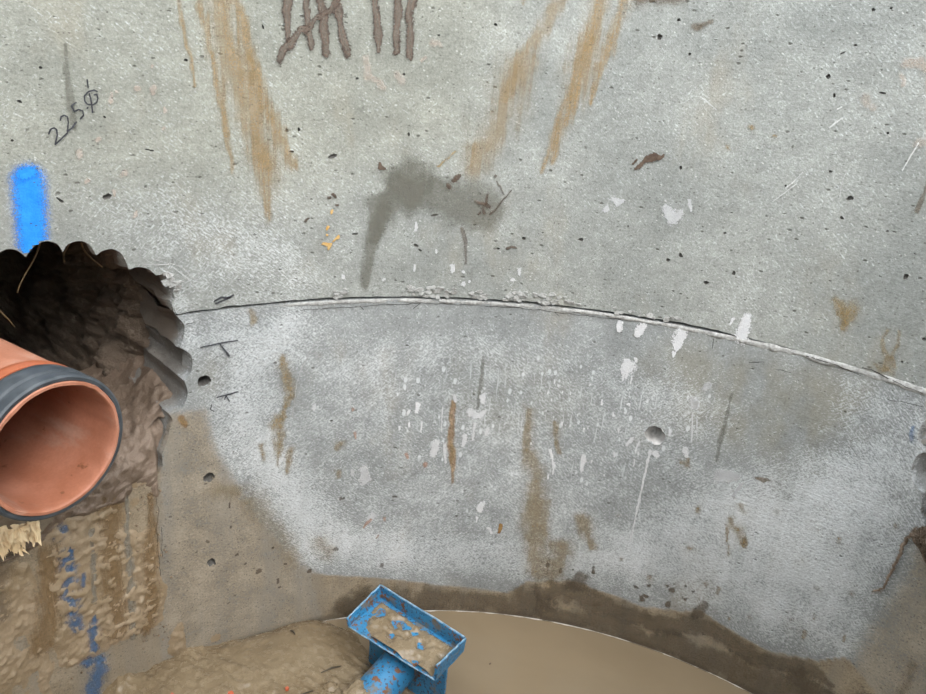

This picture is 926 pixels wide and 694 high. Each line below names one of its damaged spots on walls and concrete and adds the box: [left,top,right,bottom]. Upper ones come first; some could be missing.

rust [198,0,298,219]
rust [540,0,625,173]
crack [305,303,621,320]
crack [806,356,923,407]
rust [522,409,573,579]